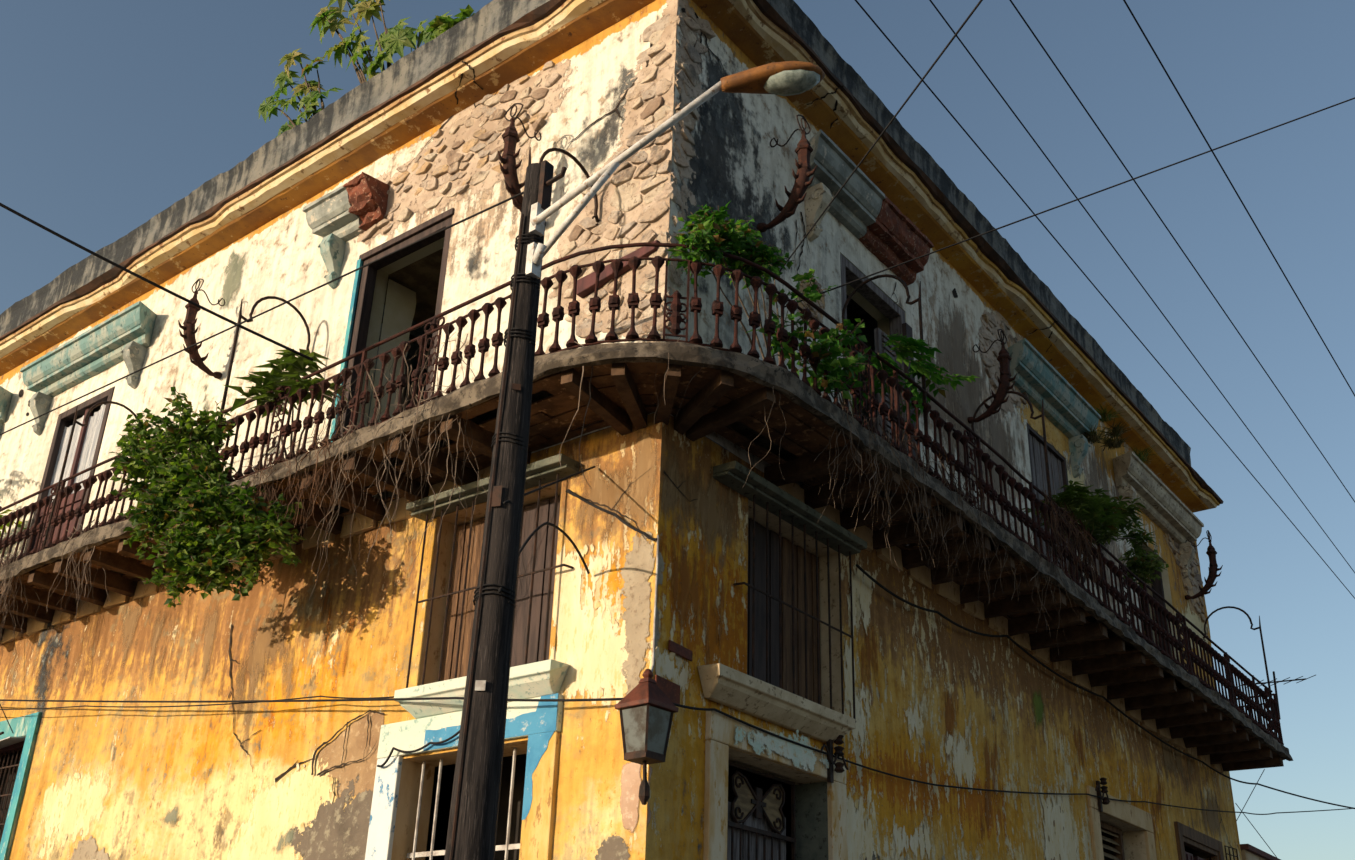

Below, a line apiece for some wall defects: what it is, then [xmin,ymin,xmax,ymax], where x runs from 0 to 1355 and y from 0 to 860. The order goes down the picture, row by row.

spalling [354,59,578,246]
spalling [548,0,716,344]
leakage [694,59,760,162]
leakage [674,160,792,271]
leakage [35,622,71,723]
peeling [227,712,384,860]
peeling [550,531,692,721]
peeling [843,565,876,759]
peeling [847,792,945,860]
peeling [905,701,924,739]
peeling [940,727,982,795]
peeling [1039,781,1079,860]